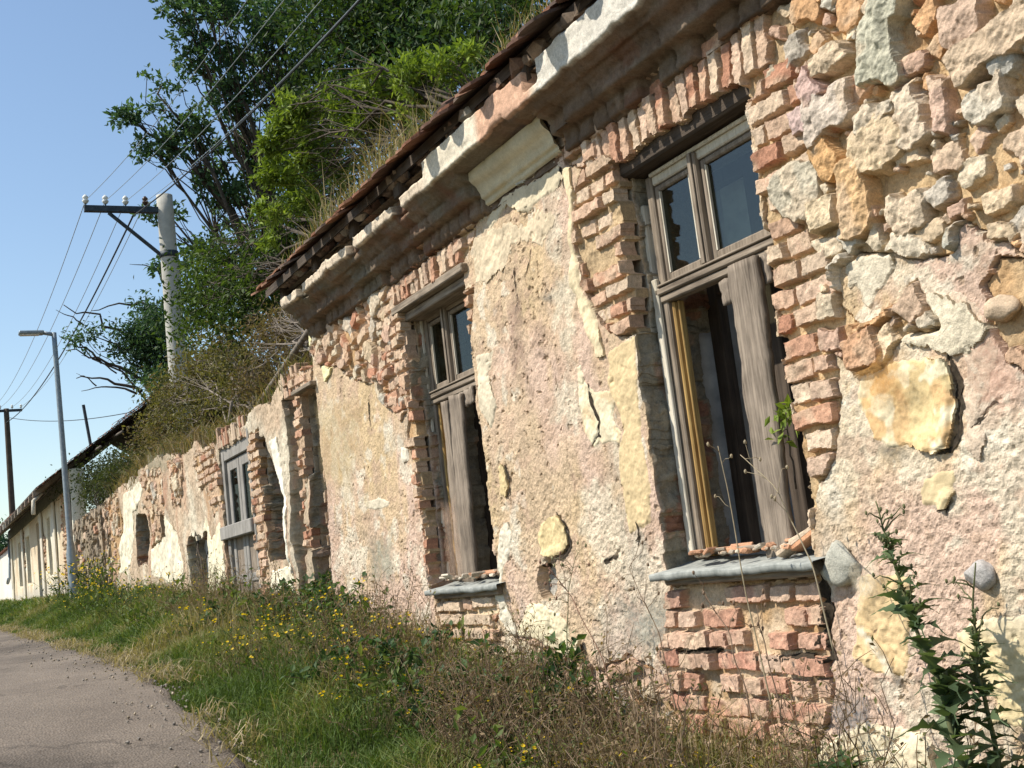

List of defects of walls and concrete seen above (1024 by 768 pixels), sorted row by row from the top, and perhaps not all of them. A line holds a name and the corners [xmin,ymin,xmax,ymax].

spalling [103,446,227,590]
crack [588,384,601,444]
spalling [247,0,1024,595]
spalling [436,522,937,768]